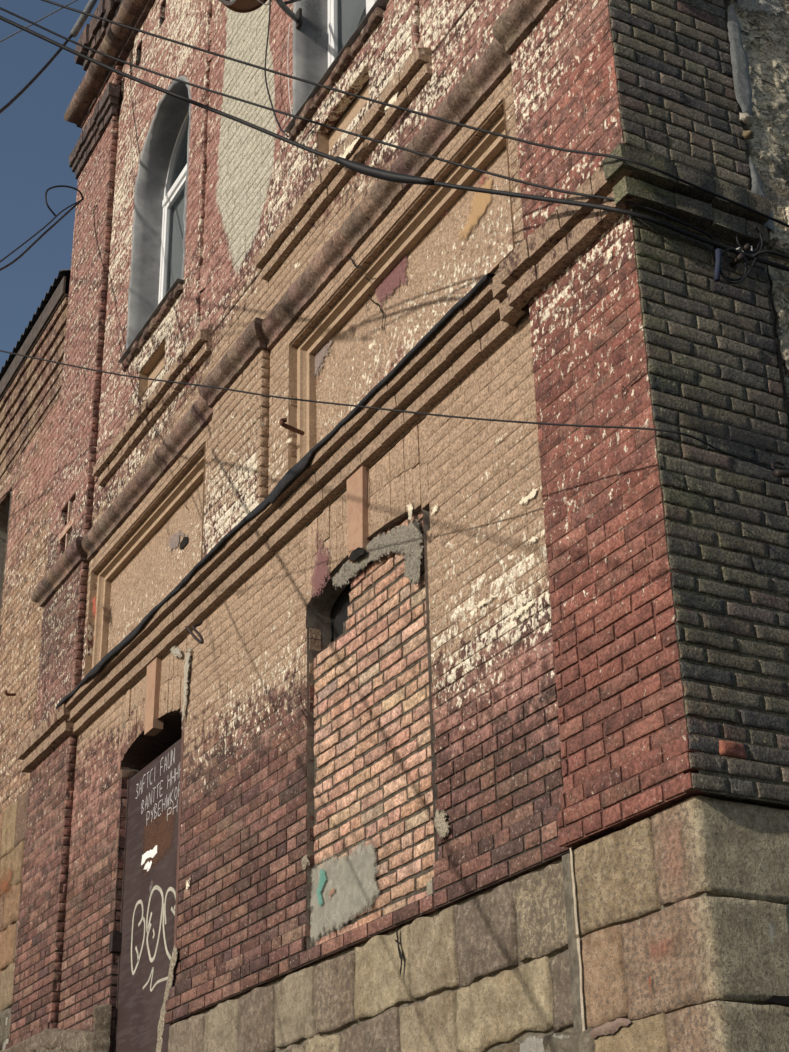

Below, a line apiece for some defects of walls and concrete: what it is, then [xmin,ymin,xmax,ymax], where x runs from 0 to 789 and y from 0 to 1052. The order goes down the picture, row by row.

crack [767,265,789,425]
peeling [310,530,330,597]
spalling [348,547,365,560]